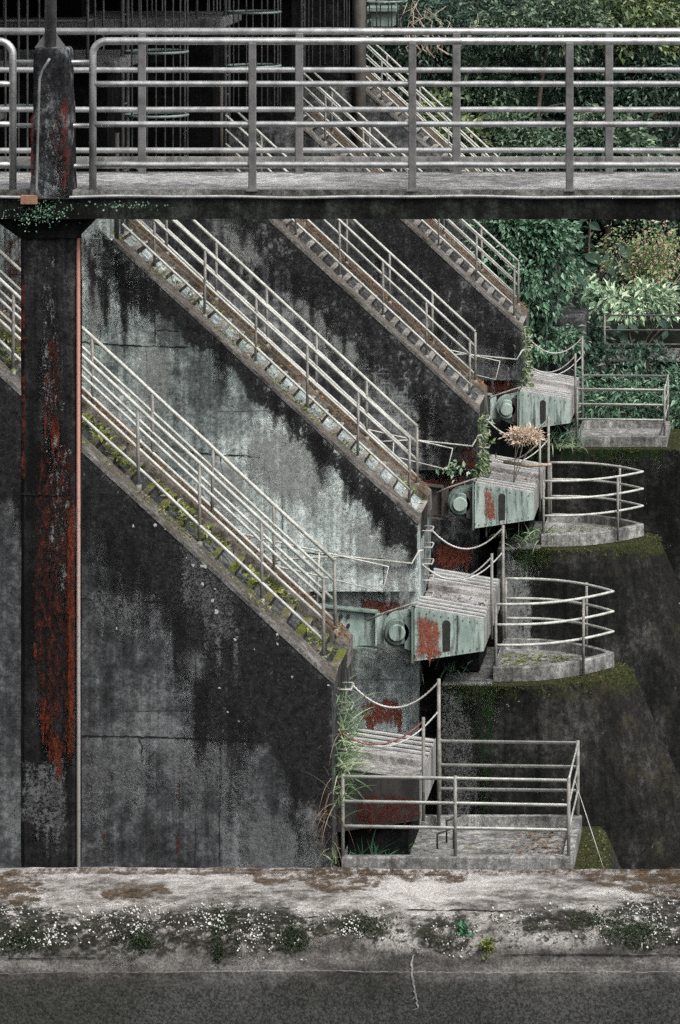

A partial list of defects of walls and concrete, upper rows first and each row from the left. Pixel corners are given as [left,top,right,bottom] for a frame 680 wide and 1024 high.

water stain [84,231,417,606]
rust [2,236,76,780]
rust [433,544,474,573]
rust [484,488,495,522]
crack [82,735,268,865]
water stain [81,453,332,868]
rust [362,699,403,732]
rust [357,794,421,832]
rust [414,617,443,664]
water stain [441,686,490,815]